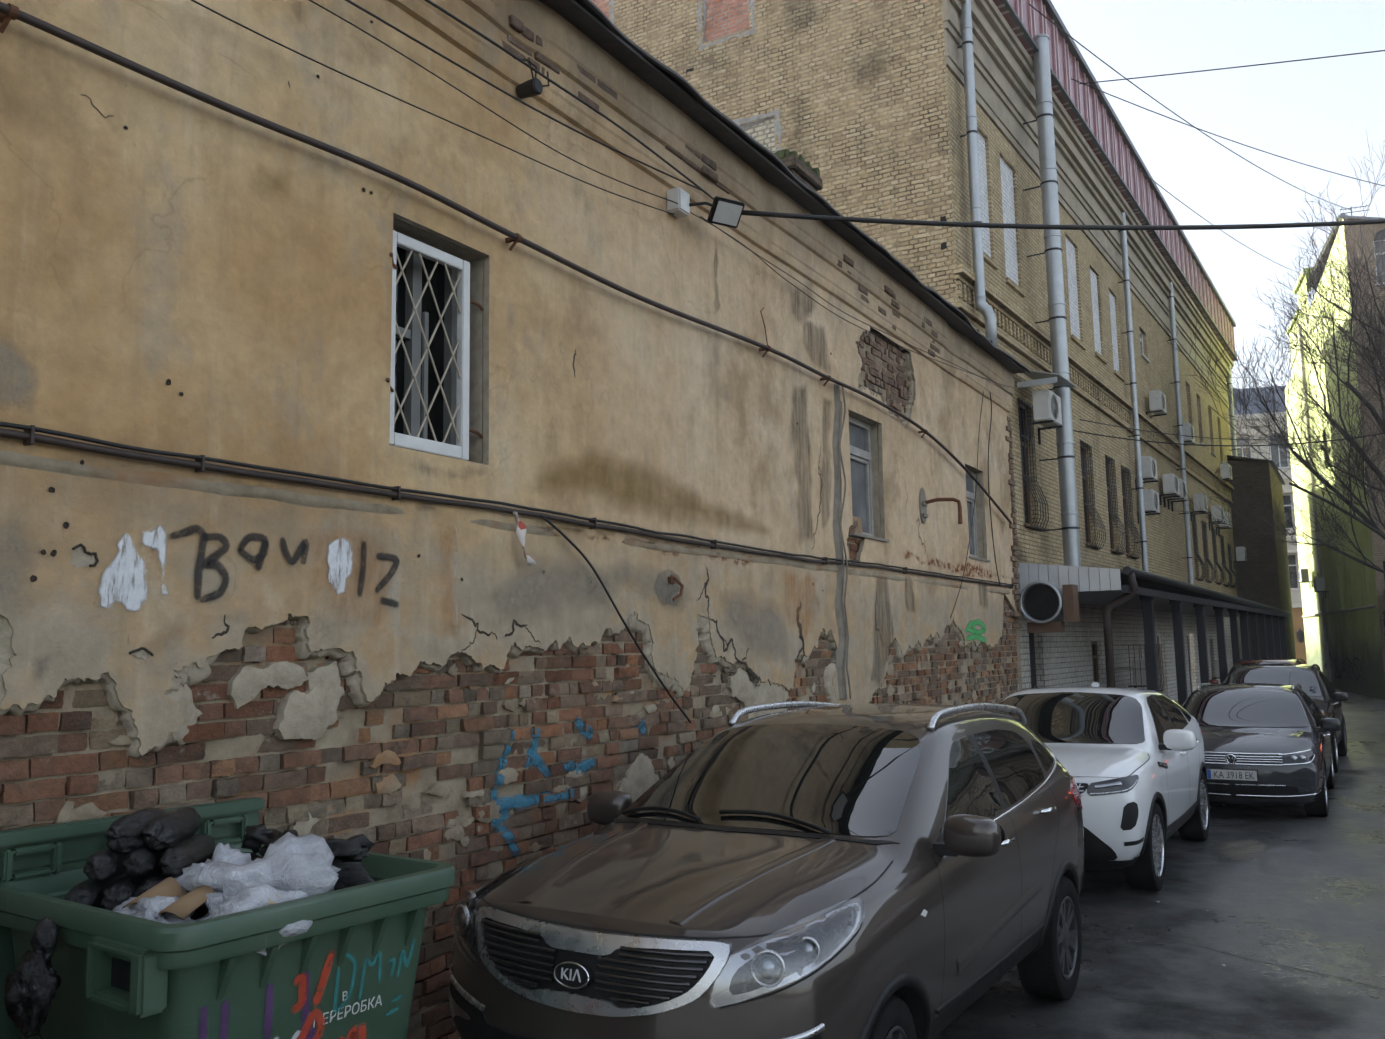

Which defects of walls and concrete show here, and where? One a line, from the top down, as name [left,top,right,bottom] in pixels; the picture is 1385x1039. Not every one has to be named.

flaking render [837,254,914,426]
flaking render [921,316,940,357]
spalling [0,451,405,514]
spalling [471,519,562,537]
spalling [621,516,968,590]
crack [460,614,541,658]
crack [697,567,760,687]
crack [796,602,805,668]
flaking render [868,589,1019,706]
flaking render [0,612,837,1039]